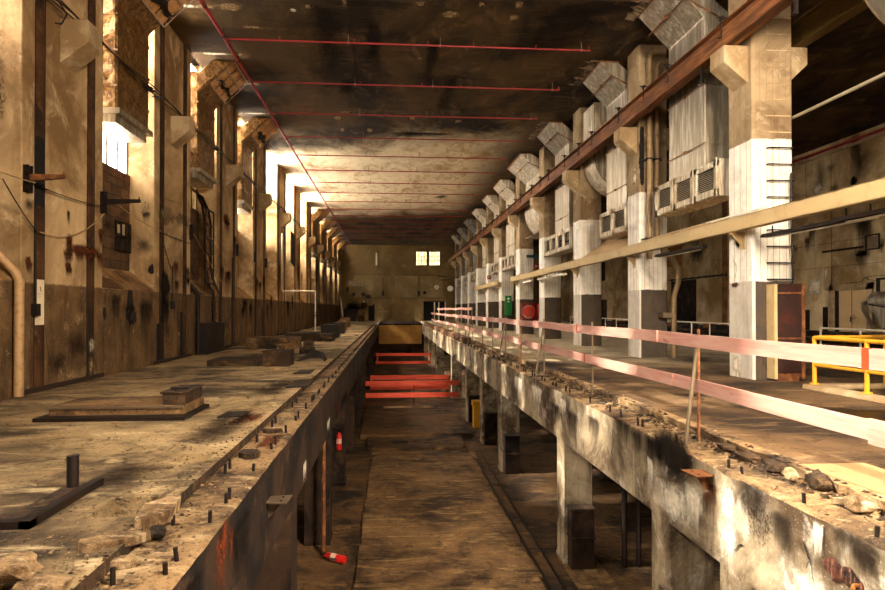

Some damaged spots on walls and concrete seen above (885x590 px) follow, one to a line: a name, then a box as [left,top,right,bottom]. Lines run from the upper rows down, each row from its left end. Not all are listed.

water stain [286,2,347,59]
water stain [719,482,790,561]
water stain [813,524,823,550]
water stain [836,530,877,570]
water stain [781,558,823,590]
spalling [823,558,861,586]